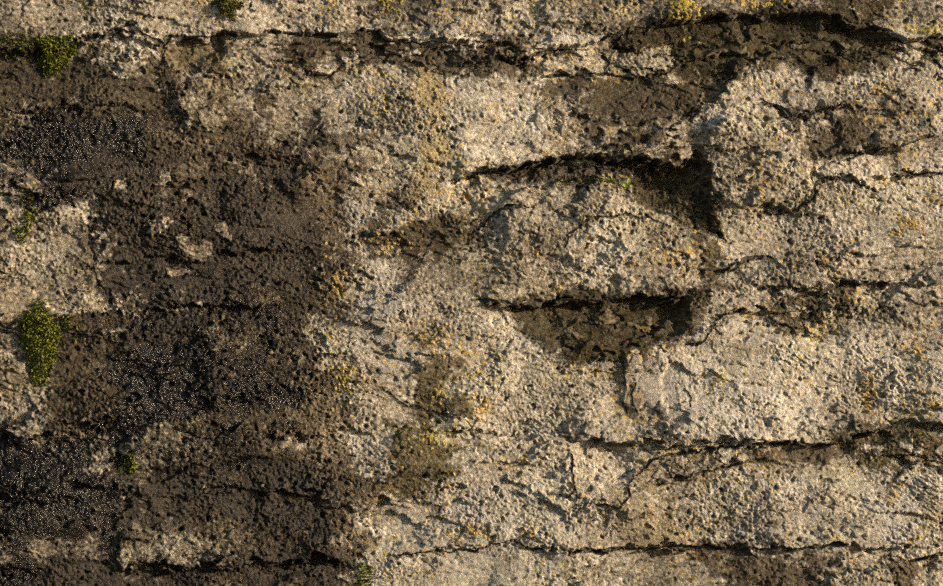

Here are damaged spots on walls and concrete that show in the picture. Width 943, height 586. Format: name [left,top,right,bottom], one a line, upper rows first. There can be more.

water stain [0,43,588,586]
crack [565,445,577,510]
crack [600,424,897,509]